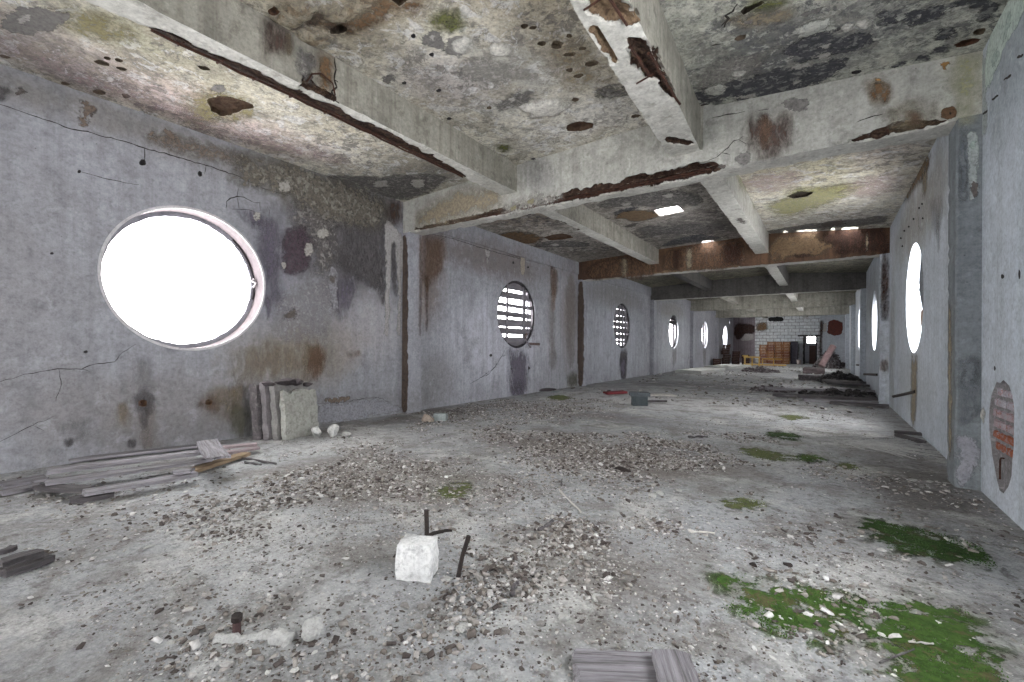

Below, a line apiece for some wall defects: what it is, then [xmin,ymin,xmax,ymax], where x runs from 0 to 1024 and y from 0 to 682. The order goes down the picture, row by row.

spalling [537,0,681,105]
crack [0,104,288,225]
corrosion [187,90,254,124]
flaking render [147,27,466,310]
corrosion [615,210,659,222]
damp [747,113,793,159]
corrosion [402,235,442,412]
corrosion [577,239,746,386]
corrosion [769,229,890,319]
crack [0,344,136,442]
spalling [956,366,1014,493]